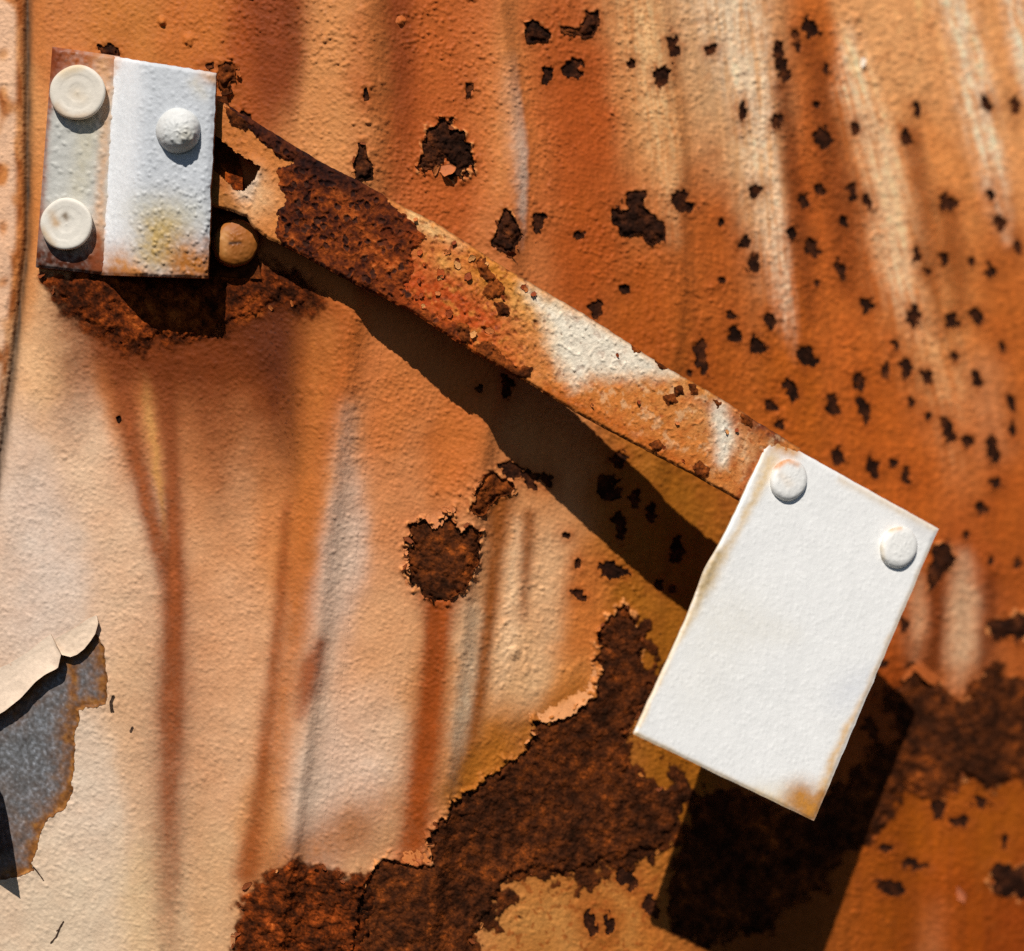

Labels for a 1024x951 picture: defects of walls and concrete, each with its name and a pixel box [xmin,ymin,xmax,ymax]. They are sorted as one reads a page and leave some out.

peeling [0,615,108,880]
corrosion [399,597,453,867]
corrosion [449,495,542,800]
corrosion [930,576,943,669]